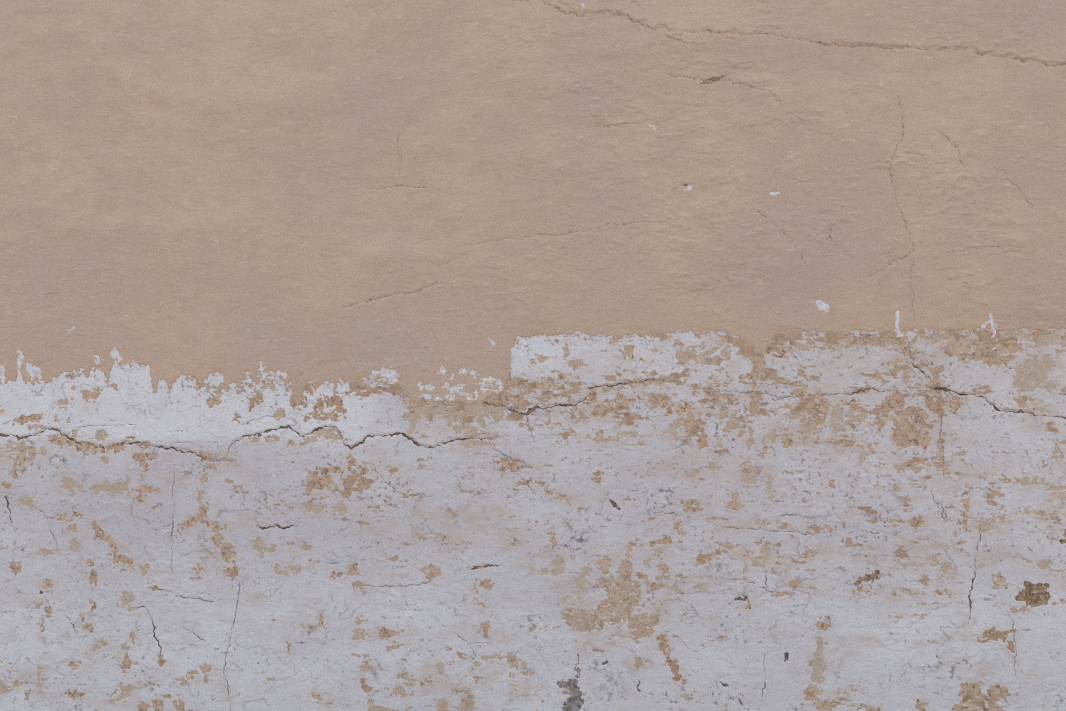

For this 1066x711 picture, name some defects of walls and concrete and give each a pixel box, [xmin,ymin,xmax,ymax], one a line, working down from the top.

crack [514,0,1066,67]
crack [344,219,678,308]
crack [828,96,963,315]
peeling [0,383,161,503]
peeling [193,361,347,448]
peeling [403,311,1066,533]
crack [908,343,1066,522]
crack [0,379,899,711]
peeling [538,500,701,702]
crack [968,533,981,623]
spalling [992,558,1066,614]
spalling [557,654,585,711]